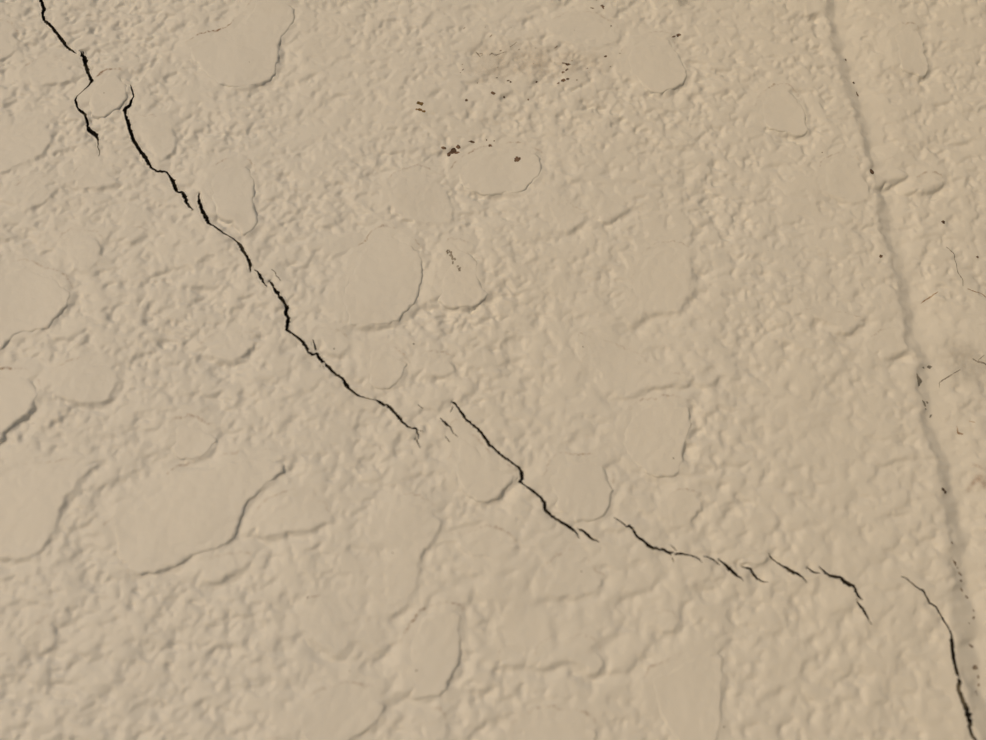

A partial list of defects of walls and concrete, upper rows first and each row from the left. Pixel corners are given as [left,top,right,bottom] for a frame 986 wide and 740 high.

crack [37,0,101,156]
crack [120,85,600,543]
crack [614,517,873,625]
crack [901,576,979,740]